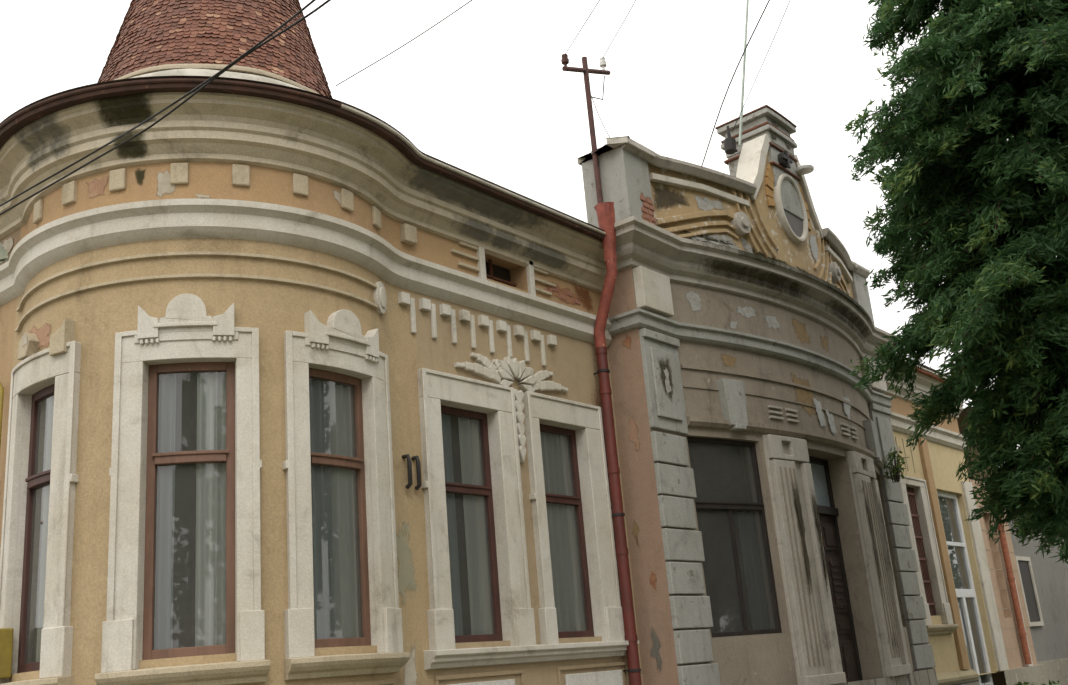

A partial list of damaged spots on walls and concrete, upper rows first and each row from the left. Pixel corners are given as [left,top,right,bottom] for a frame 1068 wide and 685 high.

flaking render [640,193,656,225]
flaking render [544,282,581,305]
water stain [794,489,828,593]
water stain [866,502,894,585]